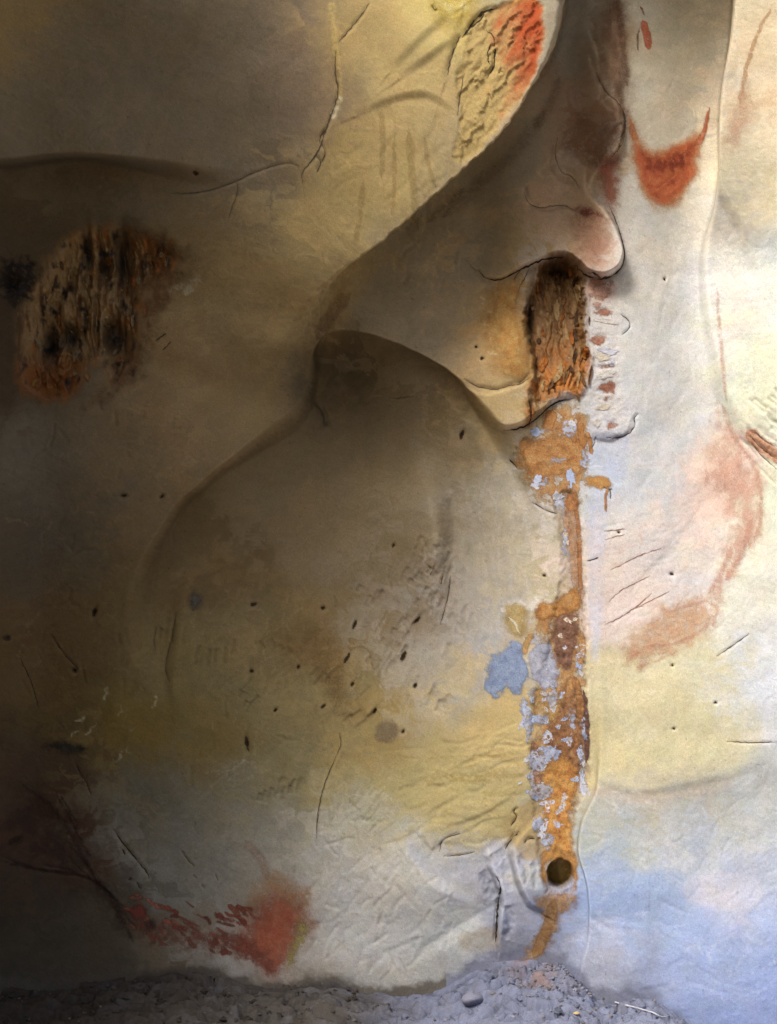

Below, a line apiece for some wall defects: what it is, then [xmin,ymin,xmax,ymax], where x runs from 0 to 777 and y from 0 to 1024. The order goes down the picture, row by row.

crack [177,5,368,219]
spalling [454,0,546,164]
corrosion [567,0,710,206]
peeling [530,450,589,509]
crack [316,737,341,838]
peeling [484,617,590,851]
corrosion [505,401,611,960]
corrosion [124,853,313,973]
crack [494,877,502,942]